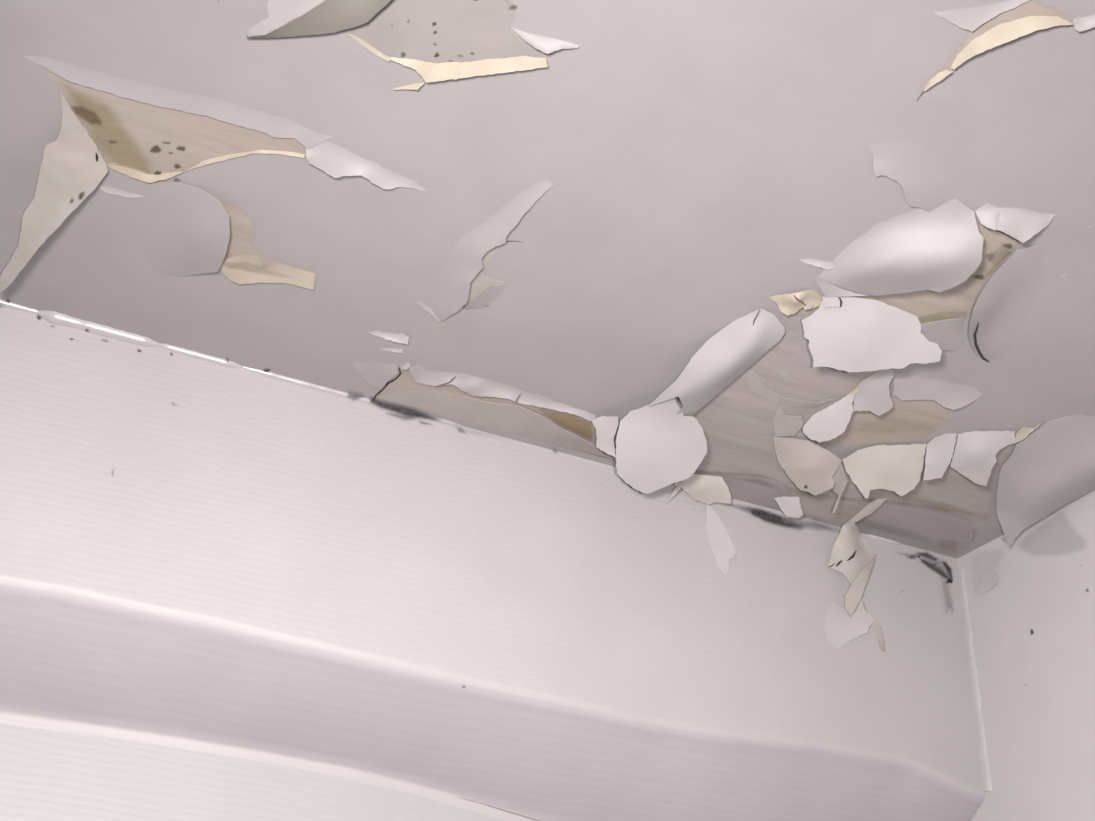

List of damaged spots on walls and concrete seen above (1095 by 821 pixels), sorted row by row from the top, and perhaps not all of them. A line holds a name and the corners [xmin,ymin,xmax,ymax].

peeling [246,0,580,90]
peeling [917,0,1095,101]
peeling [0,55,427,293]
crack [416,180,554,328]
peeling [350,198,1056,651]
damp [910,553,952,583]